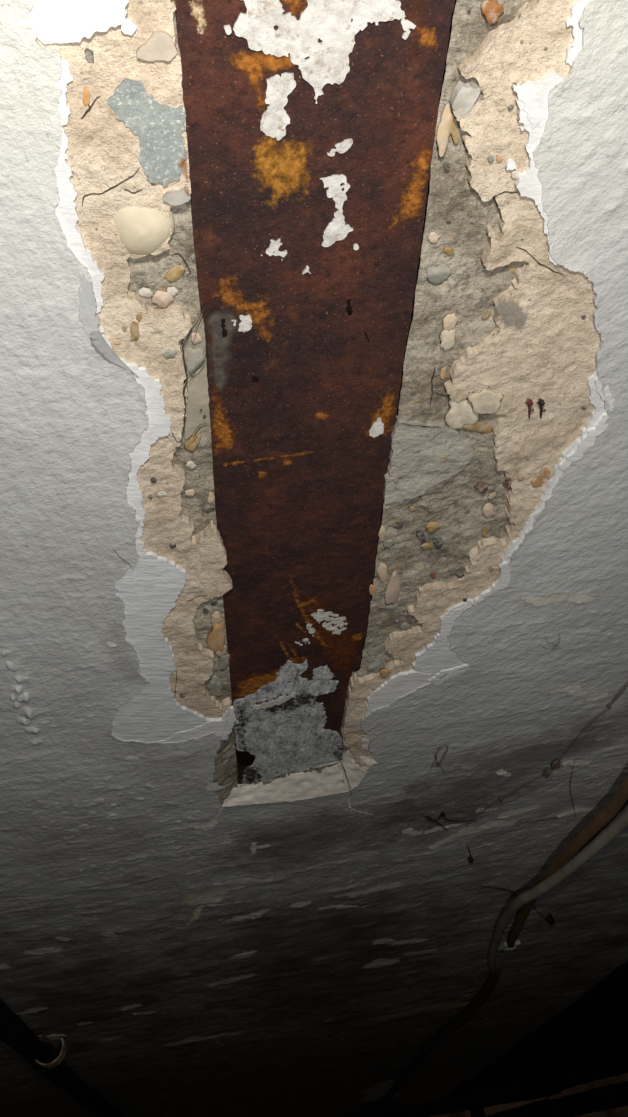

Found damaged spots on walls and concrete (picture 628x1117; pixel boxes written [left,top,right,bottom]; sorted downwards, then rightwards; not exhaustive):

rust [190,0,206,34]
rust [416,28,437,46]
rust [230,52,295,106]
rust [253,135,310,205]
rust [390,149,431,227]
rust [215,277,271,341]
rust [213,384,312,478]
flaking render [28,0,615,831]
rust [368,393,396,438]
rust [291,580,362,677]
rust [233,642,306,701]